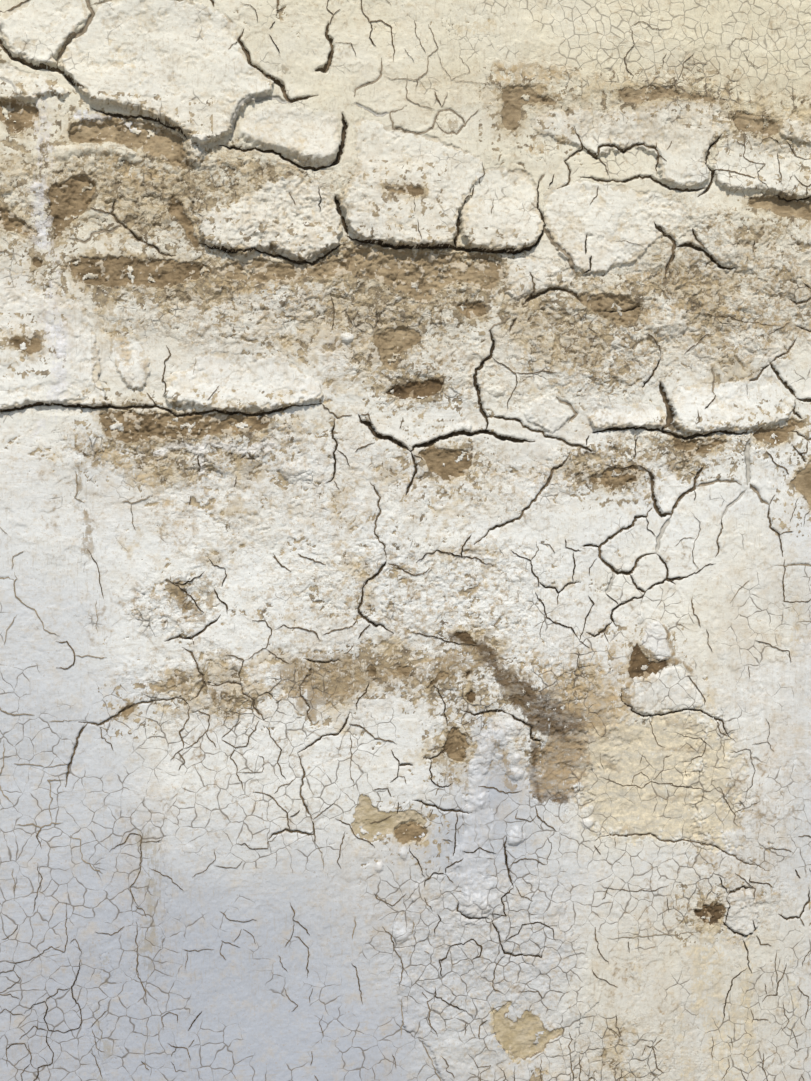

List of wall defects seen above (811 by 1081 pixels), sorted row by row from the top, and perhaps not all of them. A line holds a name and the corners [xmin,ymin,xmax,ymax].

crack [68,196,176,256]
crack [219,0,495,171]
peeling [0,0,811,319]
crack [199,126,811,279]
crack [624,21,707,80]
peeling [0,258,45,412]
peeling [61,294,324,444]
flaking render [419,447,472,481]
peeling [589,375,804,458]
crack [0,273,811,1081]
peeling [570,620,759,865]
peeling [391,869,603,1081]